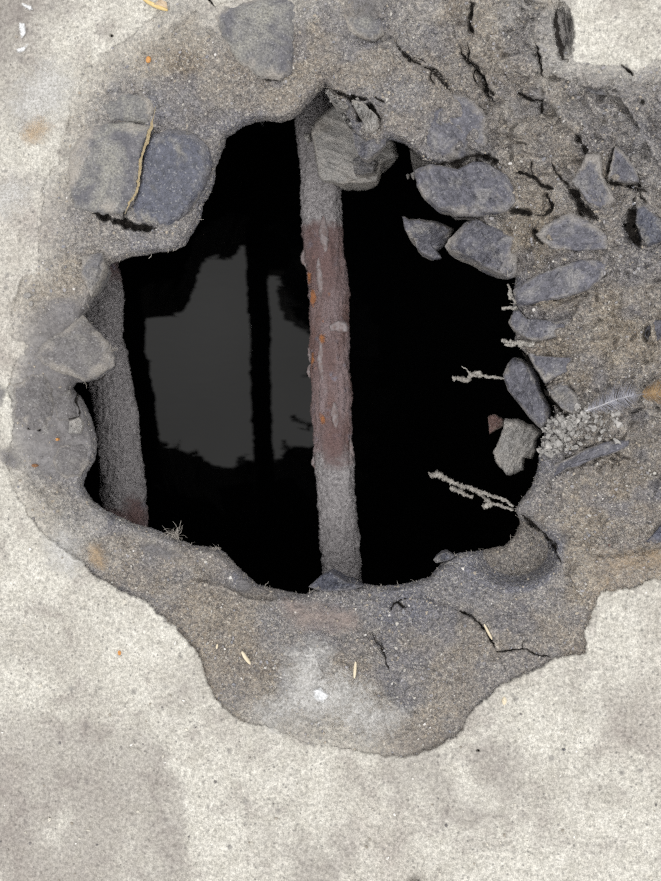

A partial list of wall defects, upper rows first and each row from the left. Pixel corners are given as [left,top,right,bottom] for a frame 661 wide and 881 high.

crack [396,43,452,92]
crack [459,2,496,104]
crack [535,43,543,77]
spalling [552,7,574,60]
peeling [325,89,349,114]
peeling [351,100,379,134]
crack [517,91,544,114]
crack [91,107,156,231]
crack [432,153,598,245]
crack [606,144,650,248]
corrosion [295,86,362,582]
spalling [550,405,578,430]